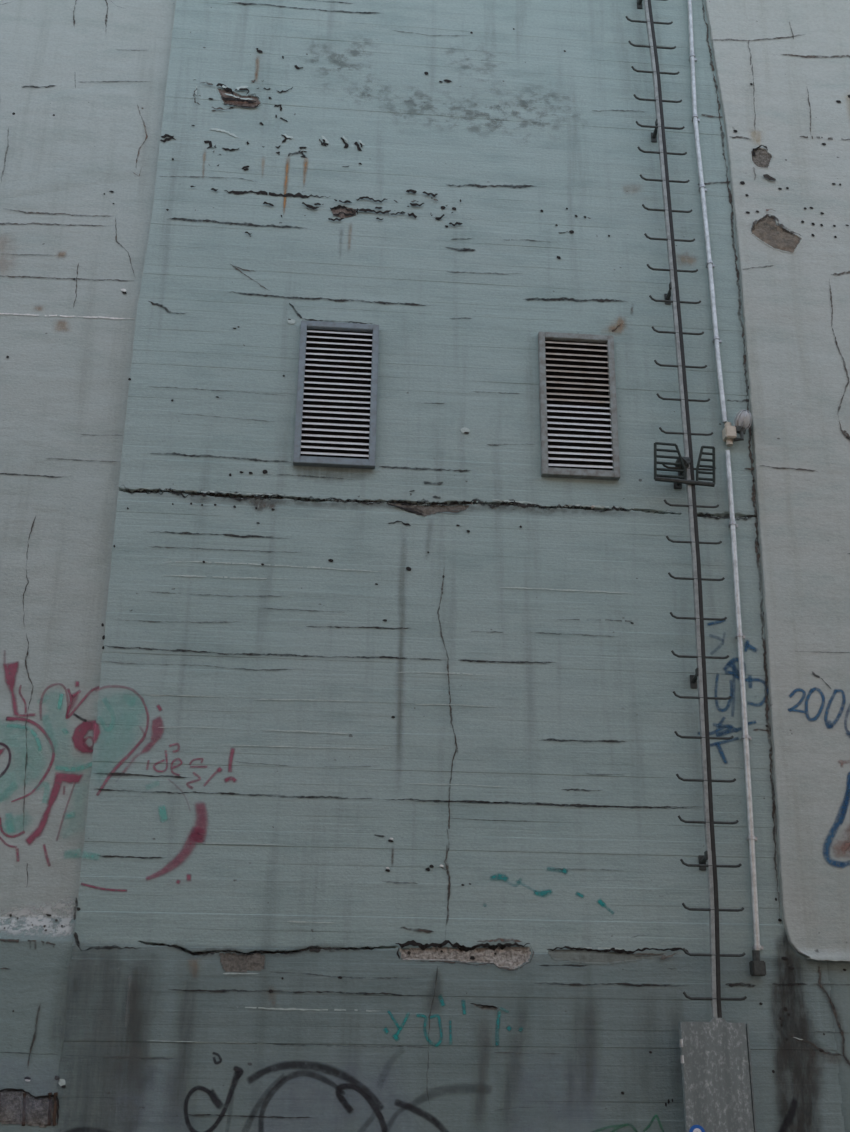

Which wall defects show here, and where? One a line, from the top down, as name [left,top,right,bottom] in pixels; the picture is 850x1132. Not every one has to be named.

spalling [193,79,307,166]
corrosion [284,152,307,209]
spalling [302,189,462,228]
spalling [740,145,789,196]
spalling [746,207,849,254]
crack [830,287,850,440]
crack [122,452,658,513]
crack [697,512,753,520]
crack [23,517,36,826]
crack [73,579,695,1094]
spalling [396,938,696,971]
damp [774,935,817,1132]